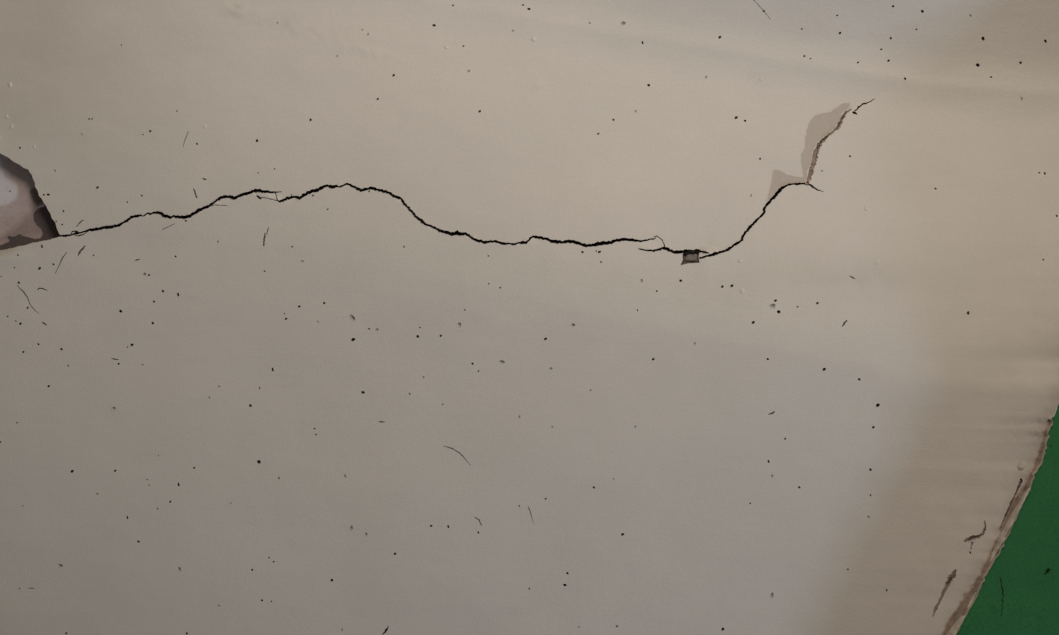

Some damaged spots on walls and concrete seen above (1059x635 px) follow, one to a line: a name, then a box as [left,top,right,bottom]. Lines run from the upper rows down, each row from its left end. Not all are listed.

spalling [0,153,64,268]
crack [61,98,876,259]